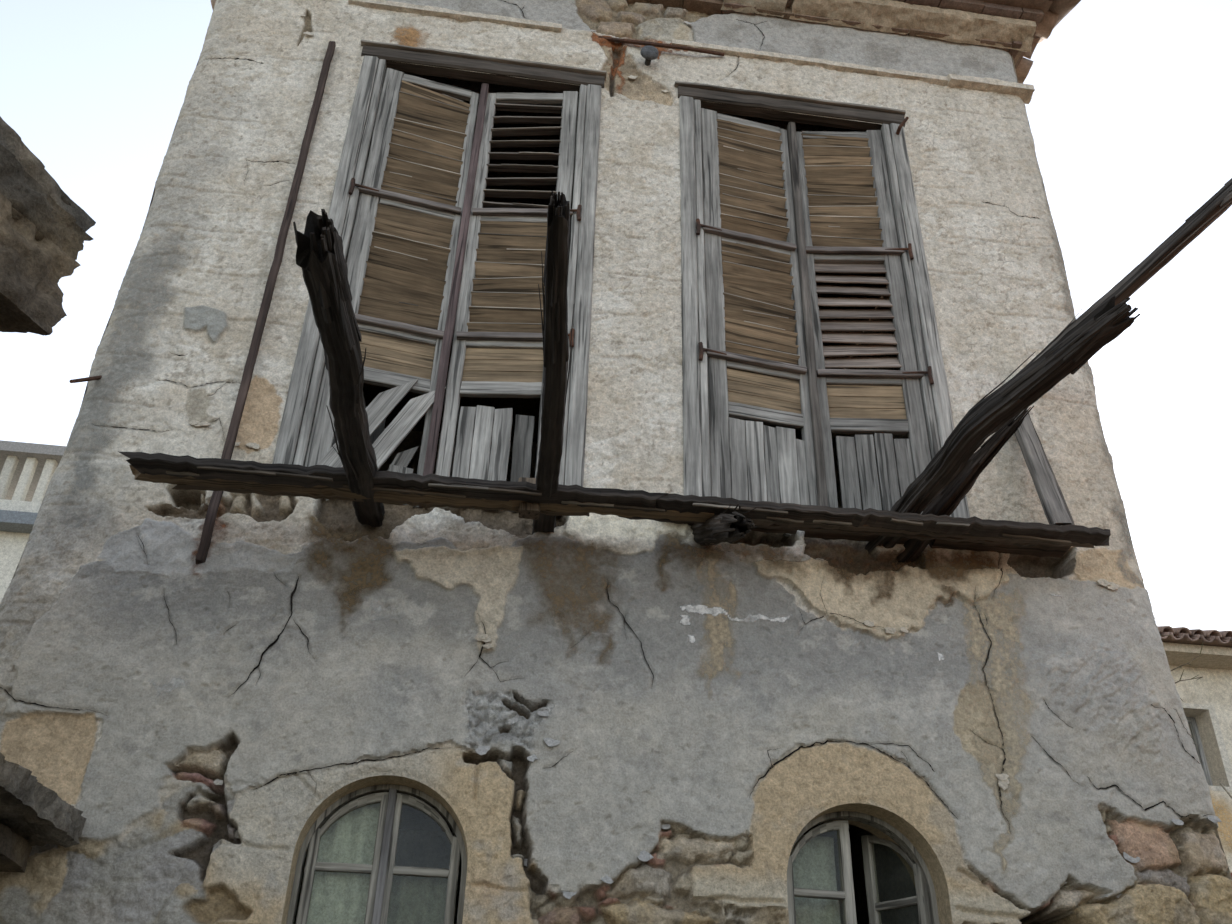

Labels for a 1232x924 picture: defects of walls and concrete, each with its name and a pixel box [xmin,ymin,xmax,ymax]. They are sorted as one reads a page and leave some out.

rust [591,32,687,90]
spalling [148,489,296,522]
crack [233,573,314,694]
crack [464,609,521,682]
crack [607,585,654,685]
crack [972,559,1011,833]
peeling [0,710,99,808]
spalling [173,732,252,924]
crack [253,748,440,791]
spalling [463,688,754,924]
spalling [973,810,1232,924]
crack [1035,740,1212,819]